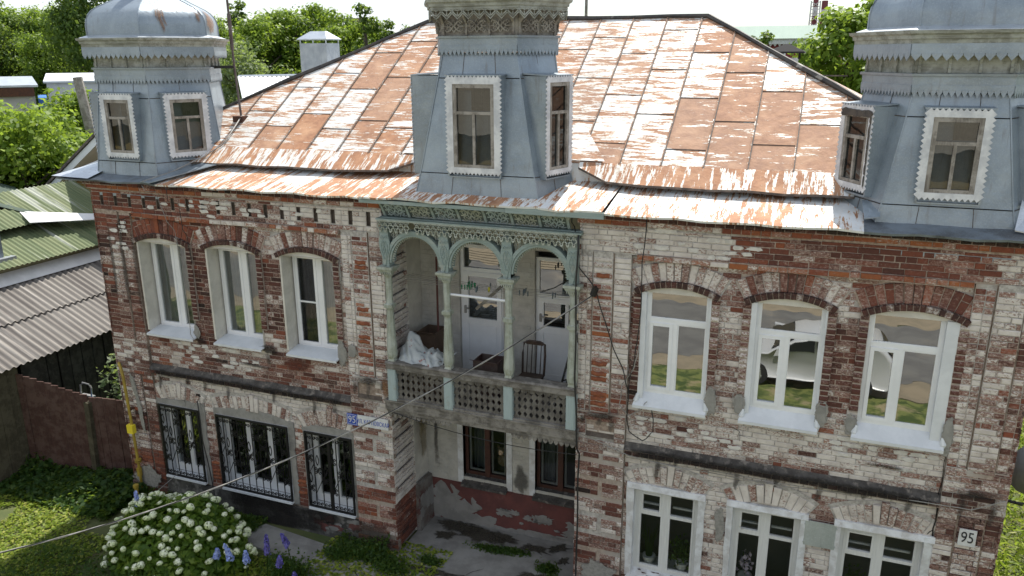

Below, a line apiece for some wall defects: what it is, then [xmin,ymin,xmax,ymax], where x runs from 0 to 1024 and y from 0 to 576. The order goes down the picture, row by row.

peeling [420,480,574,546]